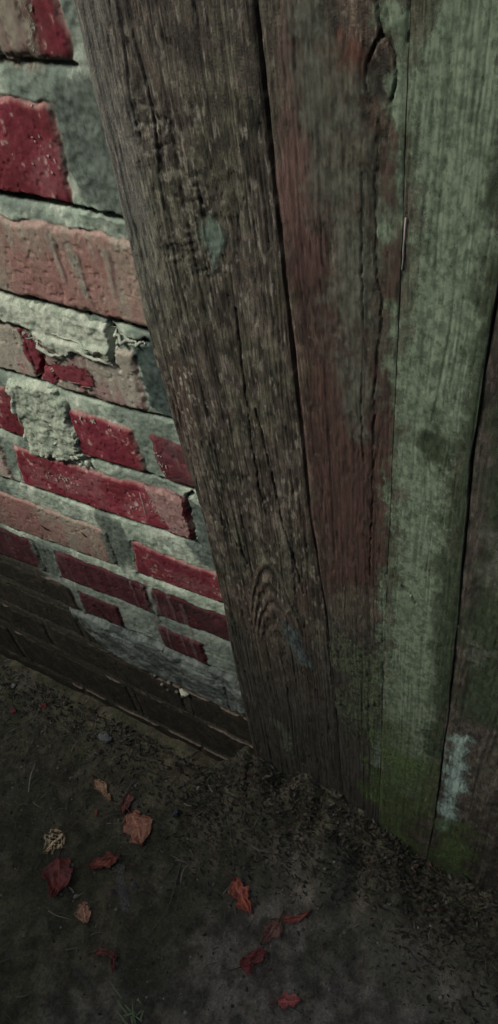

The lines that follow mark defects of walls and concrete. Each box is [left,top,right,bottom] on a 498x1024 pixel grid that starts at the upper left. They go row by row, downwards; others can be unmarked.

peeling [17,326,93,391]